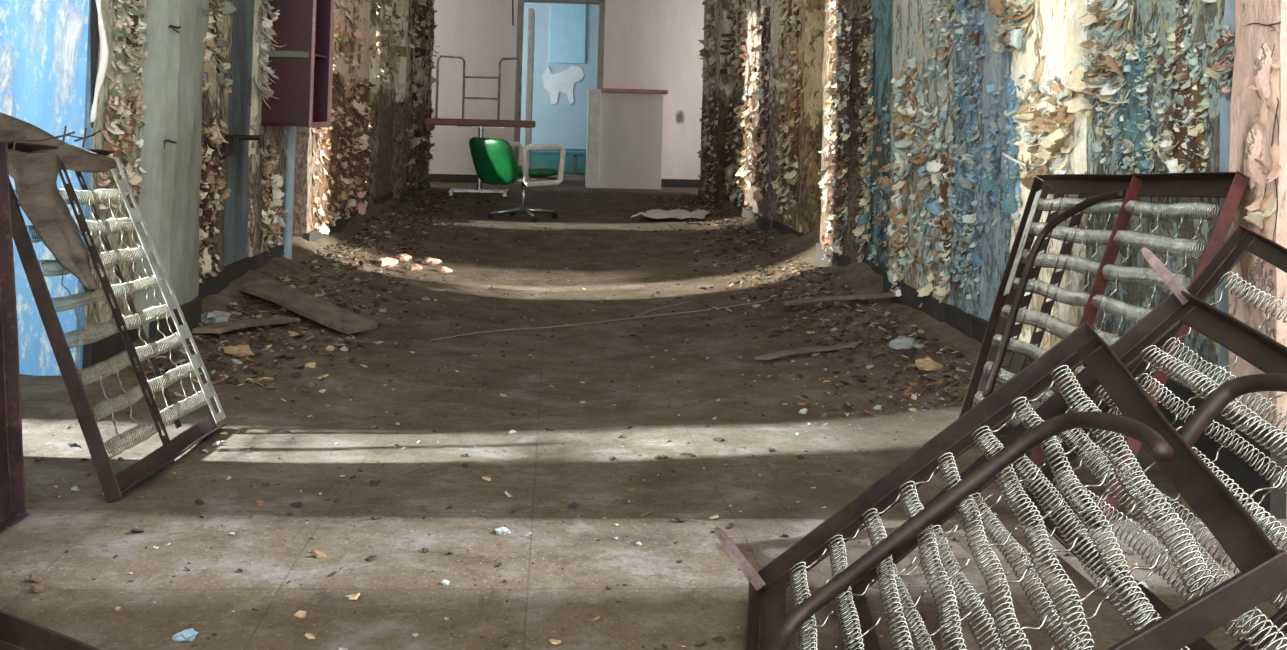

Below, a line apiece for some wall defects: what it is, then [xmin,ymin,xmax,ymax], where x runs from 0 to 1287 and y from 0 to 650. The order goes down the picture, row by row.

peeling [90,0,149,213]
peeling [199,114,232,284]
peeling [201,0,237,93]
peeling [255,0,287,109]
peeling [261,129,289,255]
flaking render [311,0,440,234]
flaking render [697,0,804,228]
flaking render [818,0,1282,307]